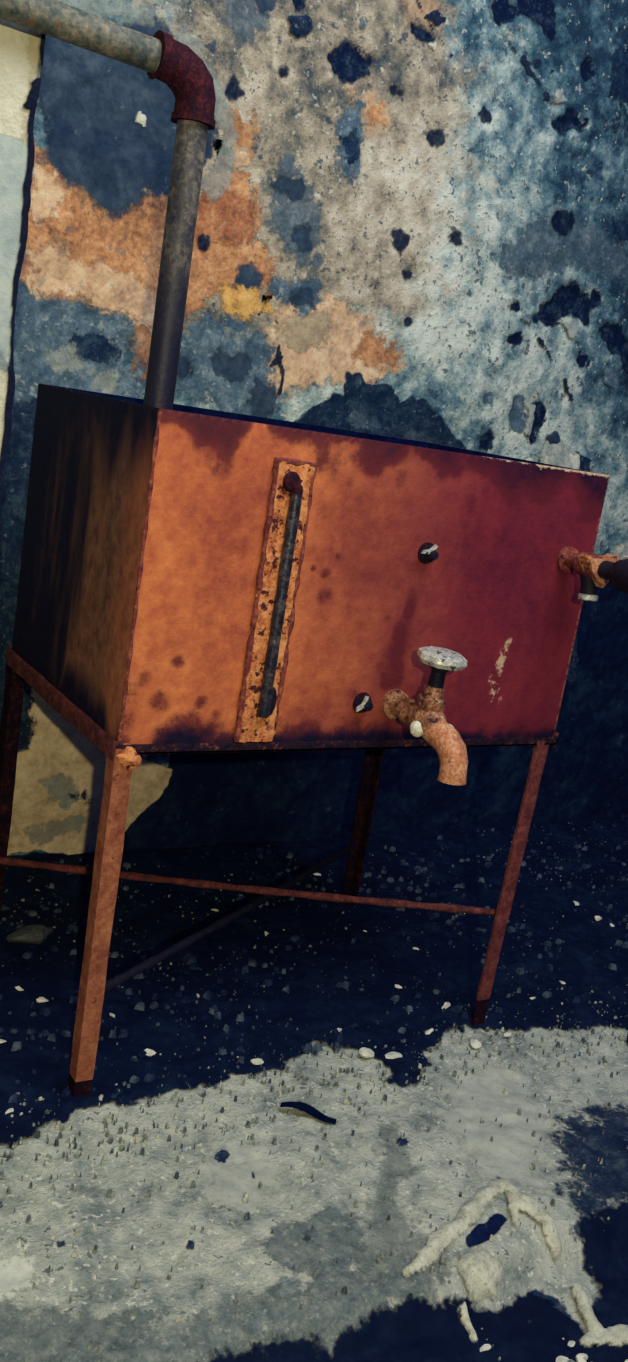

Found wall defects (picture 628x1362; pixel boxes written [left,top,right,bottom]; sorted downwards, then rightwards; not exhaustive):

damp [123,15,237,199]
damp [333,87,367,185]
corrosion [19,142,168,380]
damp [233,151,325,317]
damp [0,30,177,724]
damp [176,311,278,418]
damp [294,371,466,449]
damp [370,582,628,834]
damp [123,750,366,851]
damp [196,1142,286,1214]
damp [435,1062,628,1241]
damp [0,1206,451,1362]